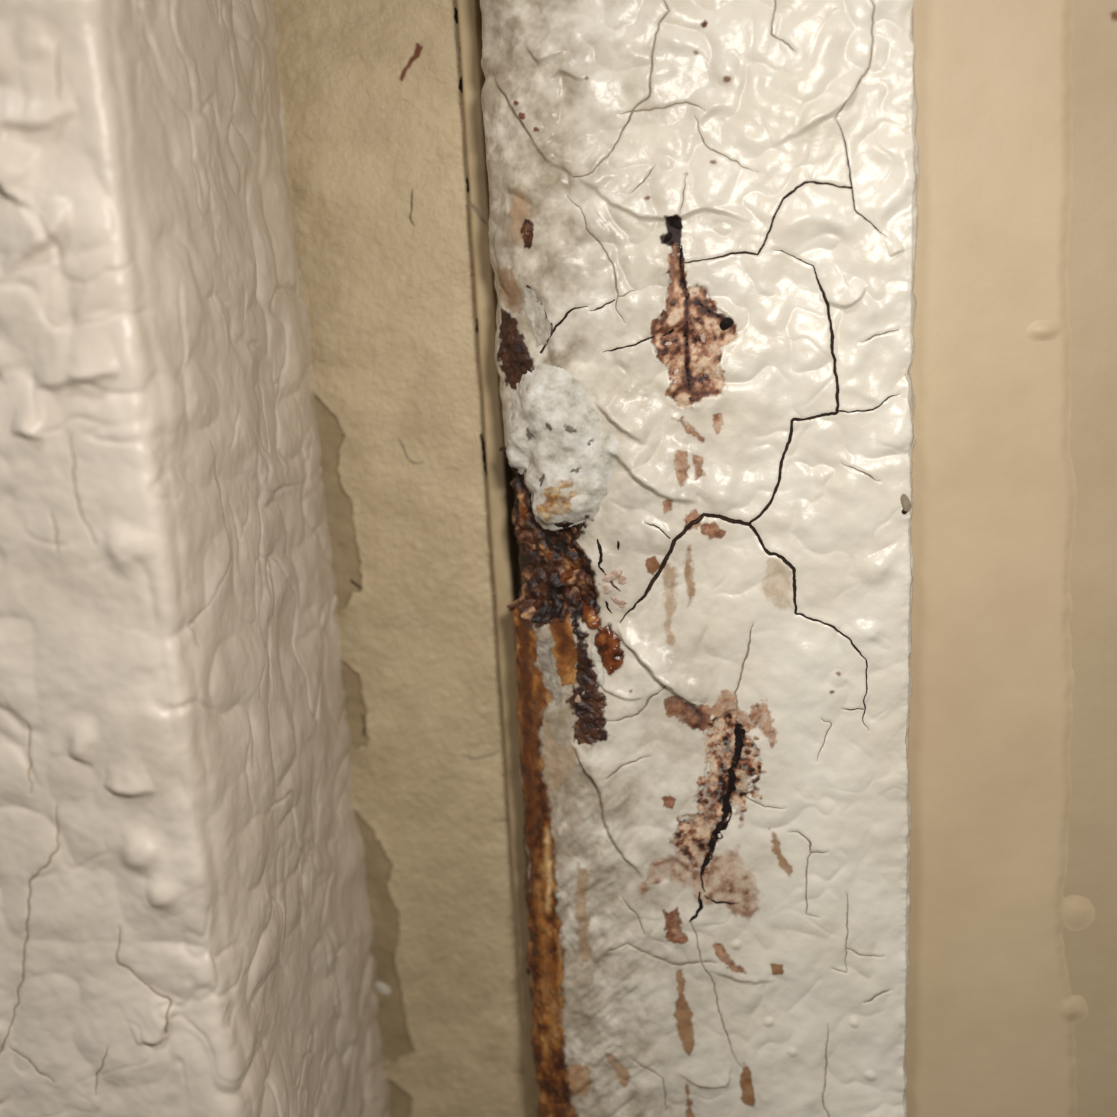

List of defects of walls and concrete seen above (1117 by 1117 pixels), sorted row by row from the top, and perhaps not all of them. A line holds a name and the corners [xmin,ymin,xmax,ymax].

crack [540,0,757,354]
corrosion [497,270,534,389]
crack [620,0,899,760]
peeling [313,395,362,609]
peeling [342,663,369,750]
peeling [355,813,414,1064]
corrosion [499,447,624,1117]
crack [607,687,665,721]
spalling [640,690,777,922]
crack [746,796,827,918]
crack [833,893,883,973]
corrosion [606,1054,630,1087]